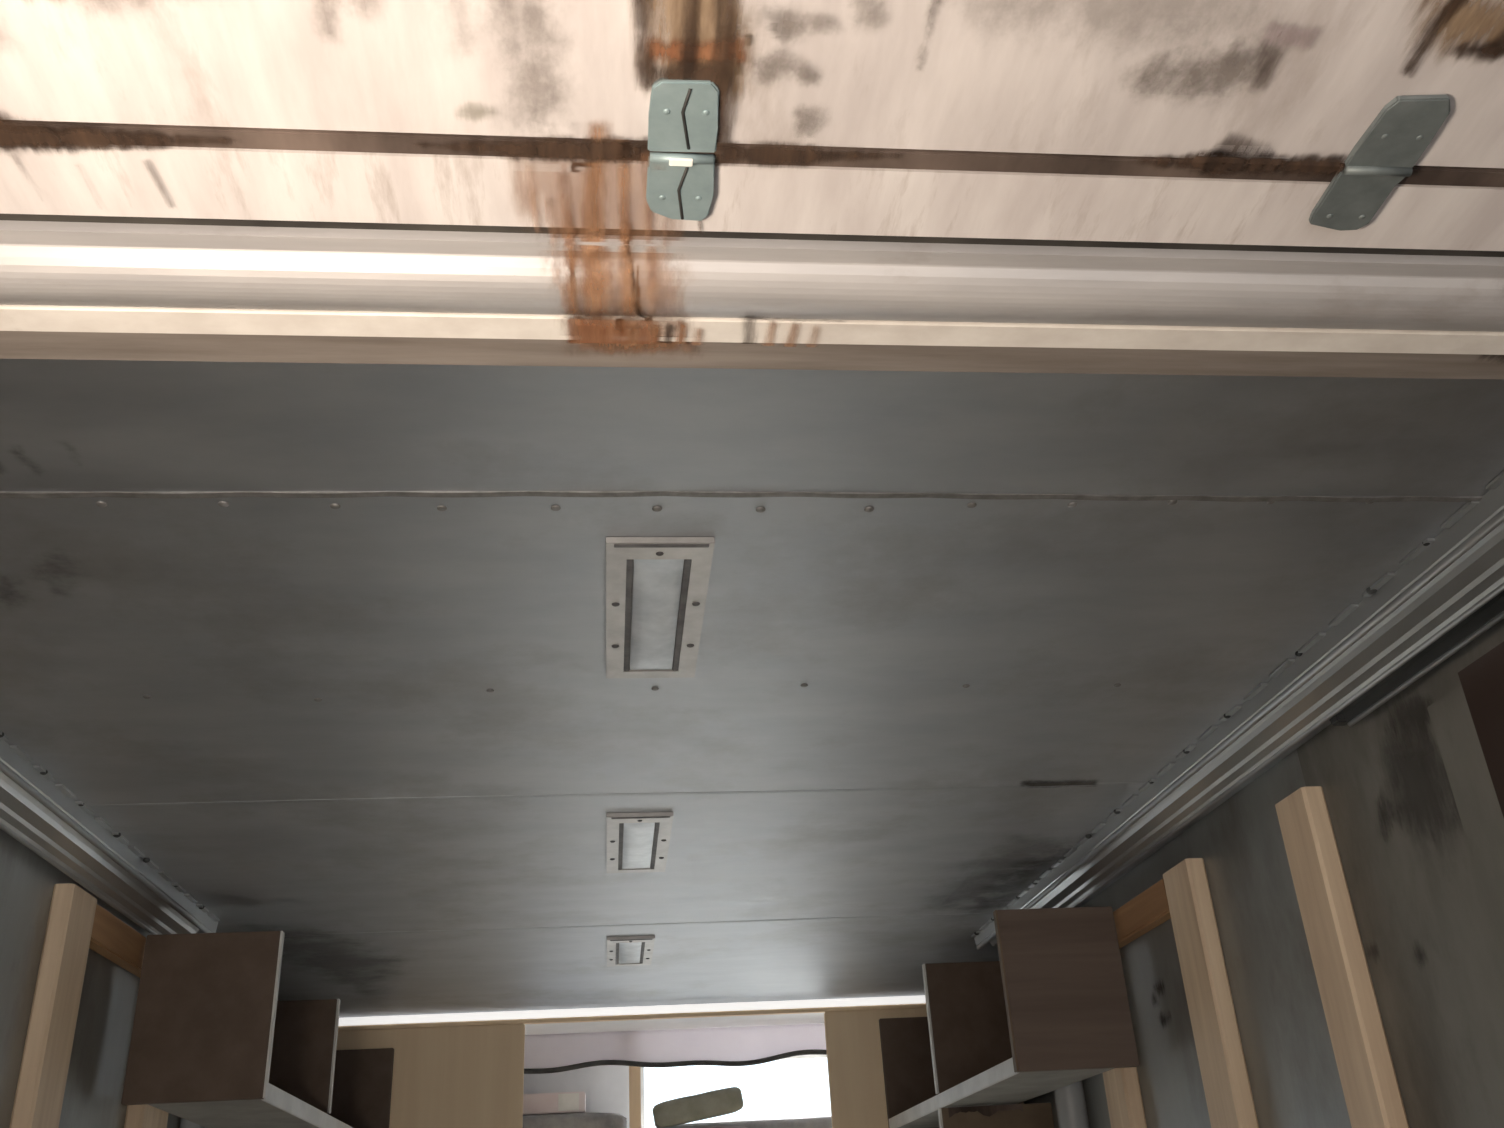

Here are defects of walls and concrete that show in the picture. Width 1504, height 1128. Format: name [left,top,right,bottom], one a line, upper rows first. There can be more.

rust [635,0,747,142]
rust [565,161,701,353]